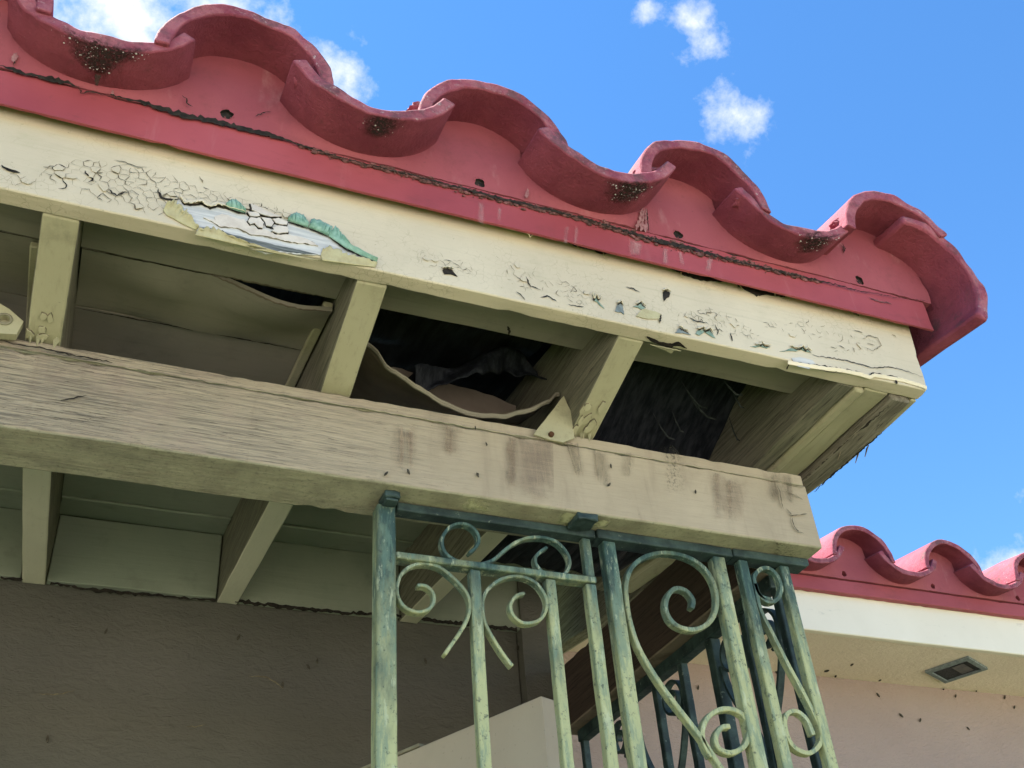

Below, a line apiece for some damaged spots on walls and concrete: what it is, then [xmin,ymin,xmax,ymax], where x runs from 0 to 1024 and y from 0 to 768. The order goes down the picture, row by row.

damp [67,30,142,74]
peeling [163,194,378,267]
crack [0,60,925,307]
damp [612,181,649,232]
damp [801,232,838,252]
peeling [592,292,662,324]
peeling [647,325,715,353]
crack [678,309,927,390]